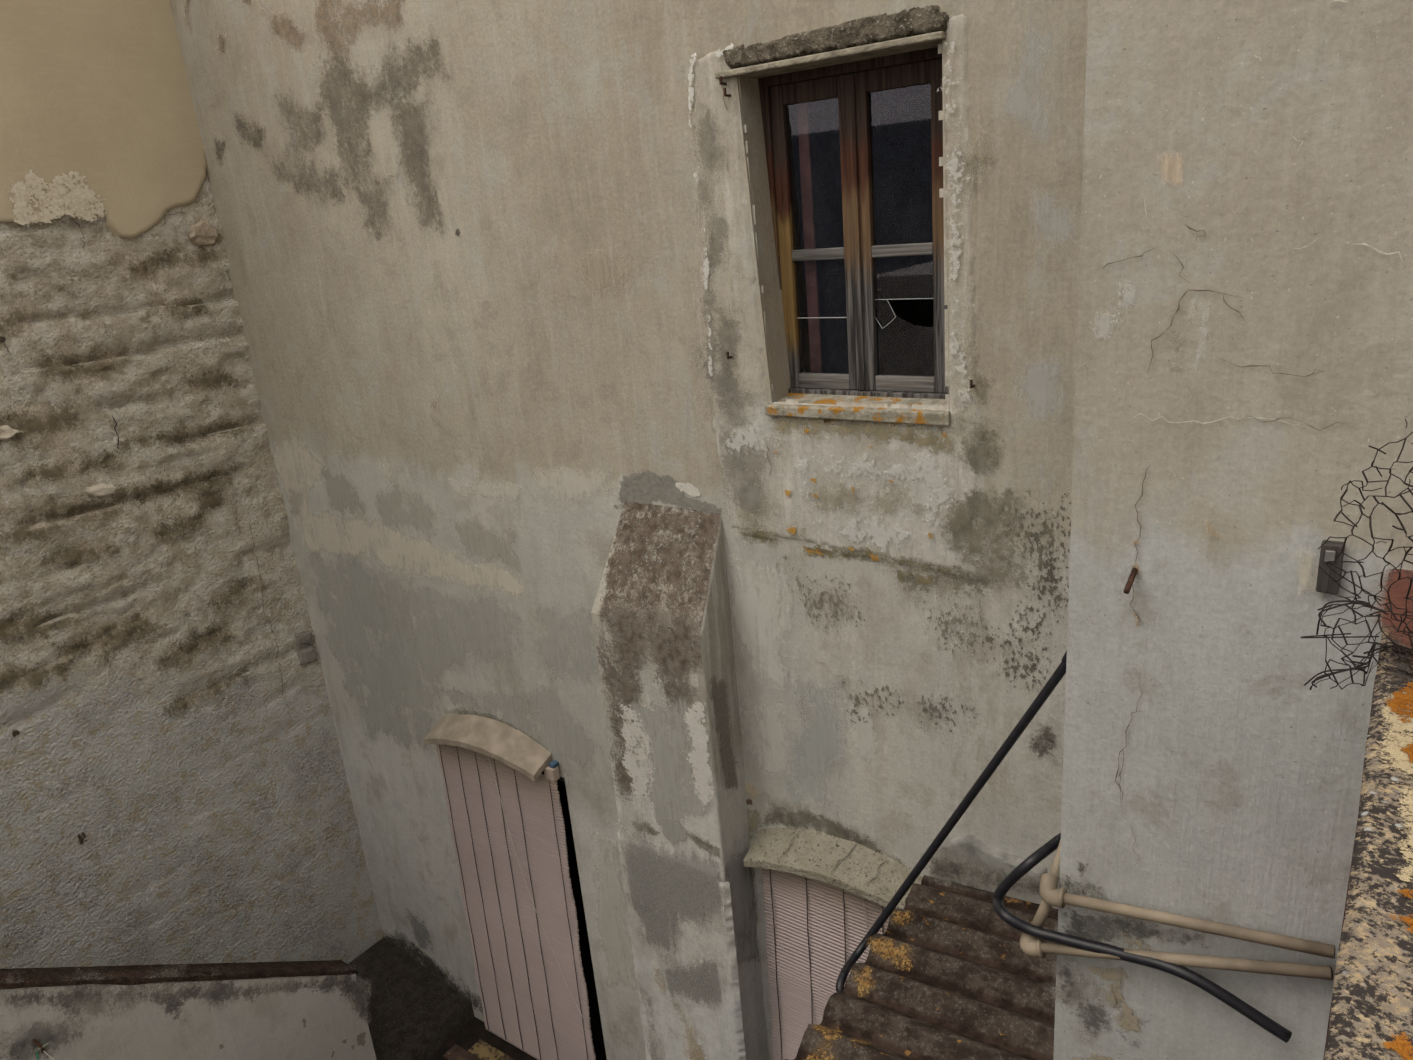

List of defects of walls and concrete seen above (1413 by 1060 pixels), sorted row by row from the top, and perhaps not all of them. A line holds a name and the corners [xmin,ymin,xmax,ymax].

damp [271,0,459,240]
flaking render [7,169,107,228]
crack [1104,198,1244,373]
crack [1359,243,1403,262]
crack [1220,358,1325,377]
flaking render [675,482,700,497]
damp [702,201,1071,690]
crack [1128,413,1339,431]
peeling [617,704,653,808]
peeling [684,701,715,810]
crack [1115,678,1143,865]